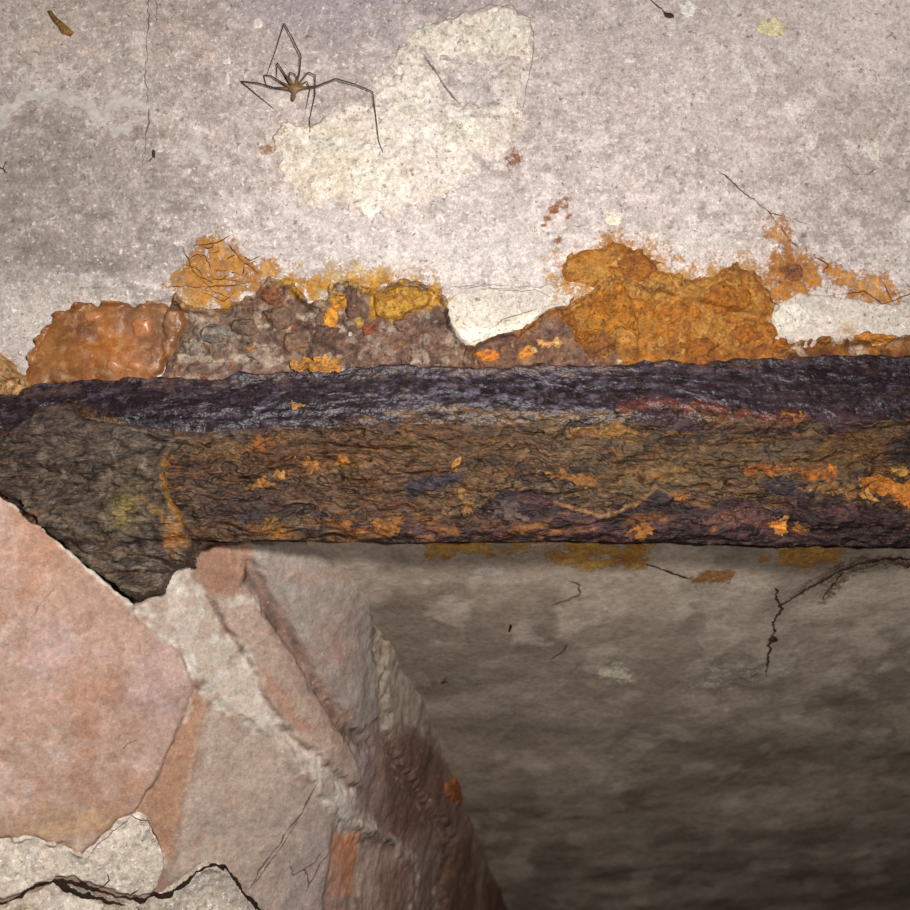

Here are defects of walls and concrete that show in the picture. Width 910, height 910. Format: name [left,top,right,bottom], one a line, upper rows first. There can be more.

spalling [272,4,537,221]
rust [541,198,572,227]
rust [0,353,30,395]
rust [162,231,450,325]
rust [290,354,342,374]
spalling [161,277,626,380]
rust [754,213,910,305]
flaking render [771,293,910,342]
rust [0,491,58,540]
rust [152,410,910,573]
rust [691,570,735,584]
crack [765,556,910,676]